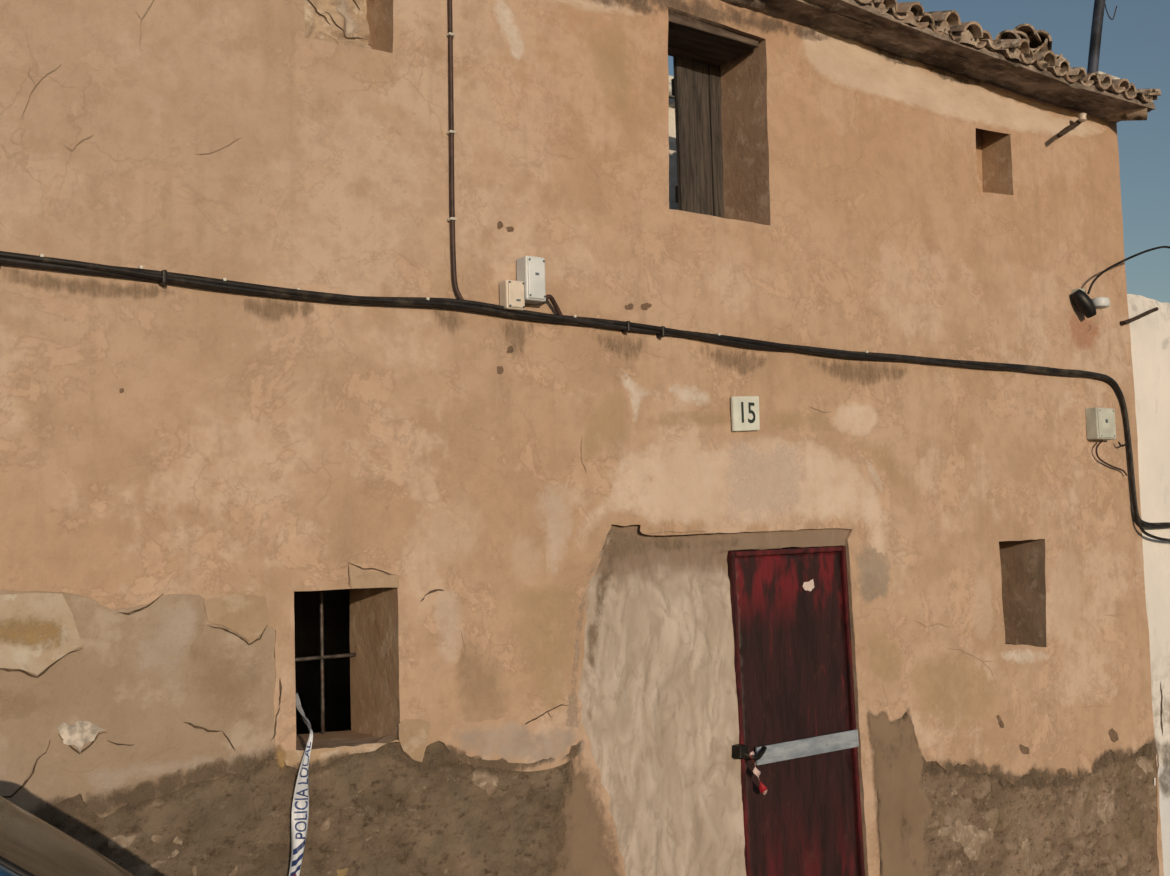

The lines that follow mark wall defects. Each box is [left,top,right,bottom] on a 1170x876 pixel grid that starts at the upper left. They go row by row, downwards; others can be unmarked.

spalling [0,590,572,876]